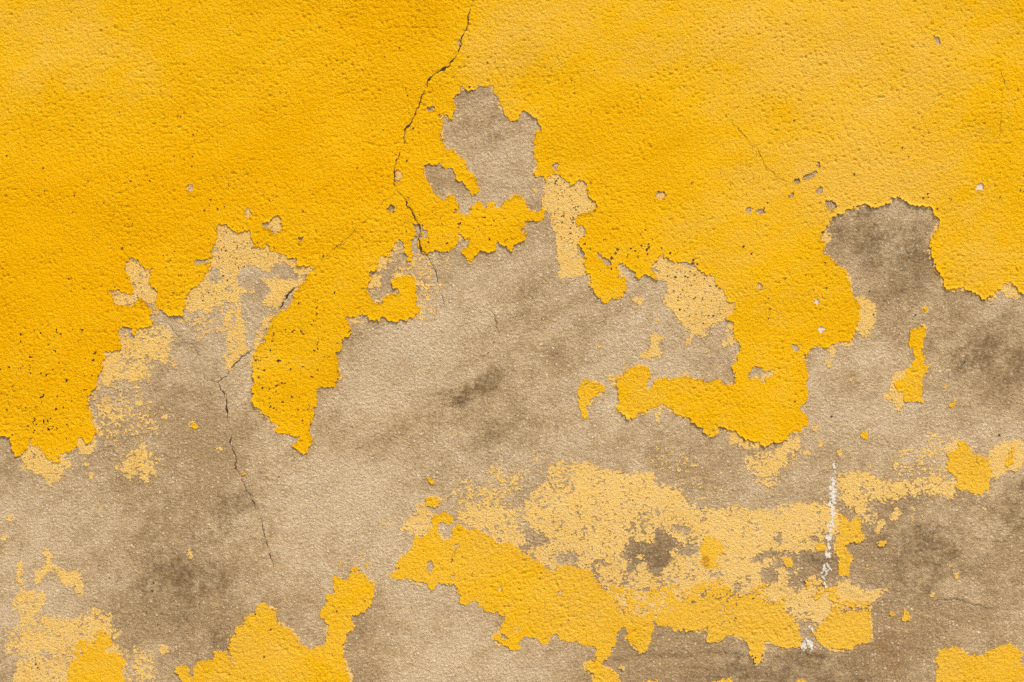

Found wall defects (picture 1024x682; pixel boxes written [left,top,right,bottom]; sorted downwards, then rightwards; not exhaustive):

crack [314,4,472,306]
spalling [788,162,821,198]
spalling [245,207,283,235]
spalling [747,365,775,384]
crack [206,351,274,567]
peeling [944,438,959,454]
peeling [988,439,1024,481]
peeling [835,460,957,523]
peeling [834,580,888,608]